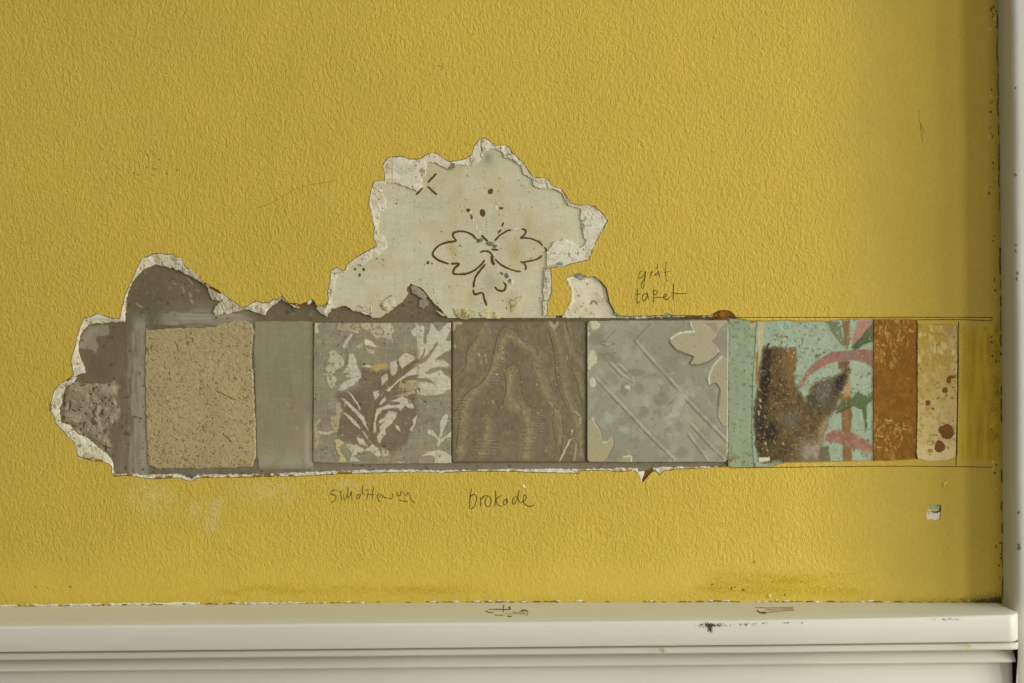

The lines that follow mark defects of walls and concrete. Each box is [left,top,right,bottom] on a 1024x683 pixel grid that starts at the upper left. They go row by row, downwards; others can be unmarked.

peeling [988,5,1000,210]
peeling [50,137,731,488]
peeling [990,235,1002,363]